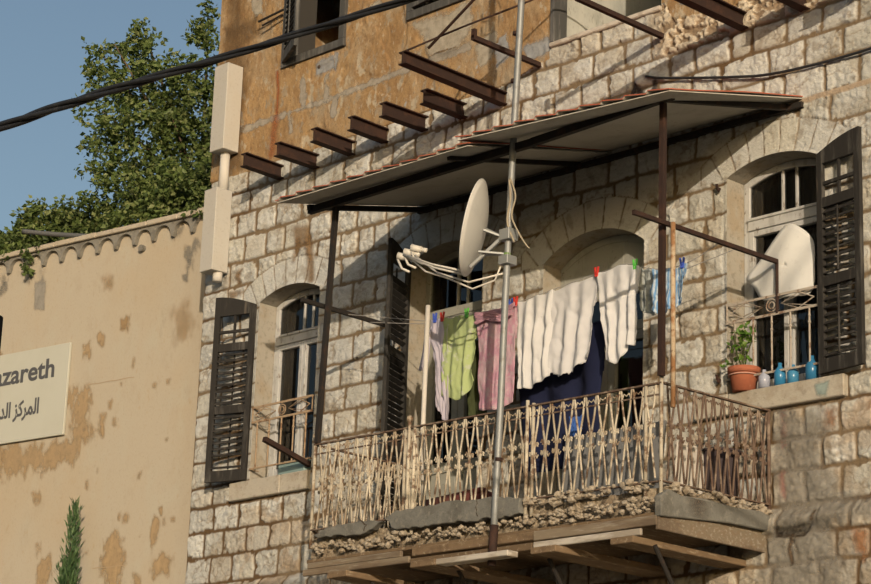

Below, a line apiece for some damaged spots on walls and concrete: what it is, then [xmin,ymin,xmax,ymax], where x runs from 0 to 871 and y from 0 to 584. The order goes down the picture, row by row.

flaking render [524,37,550,59]
peeling [83,332,104,359]
peeling [0,387,115,478]
peeling [150,507,162,545]
spalling [310,477,773,555]
peeling [102,530,125,584]
peeling [153,552,170,580]